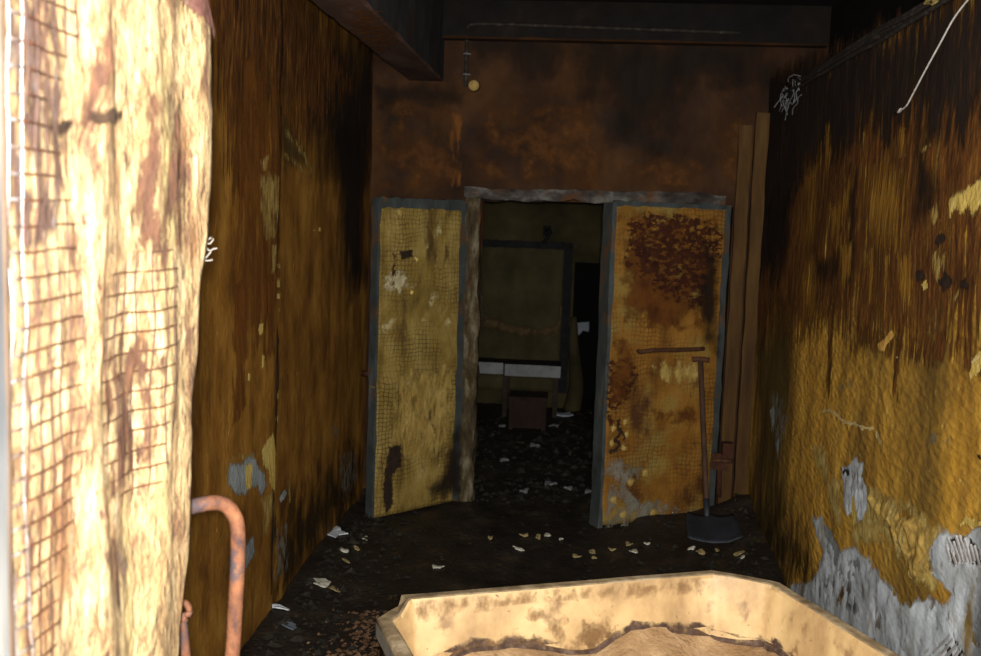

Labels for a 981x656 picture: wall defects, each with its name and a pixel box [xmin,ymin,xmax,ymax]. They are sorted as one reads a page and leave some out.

peeling [863,127,969,318]
peeling [931,180,981,224]
peeling [384,250,419,294]
rust [625,211,723,307]
peeling [877,330,894,352]
peeling [969,351,981,381]
damp [383,445,401,512]
flaking render [790,445,981,656]